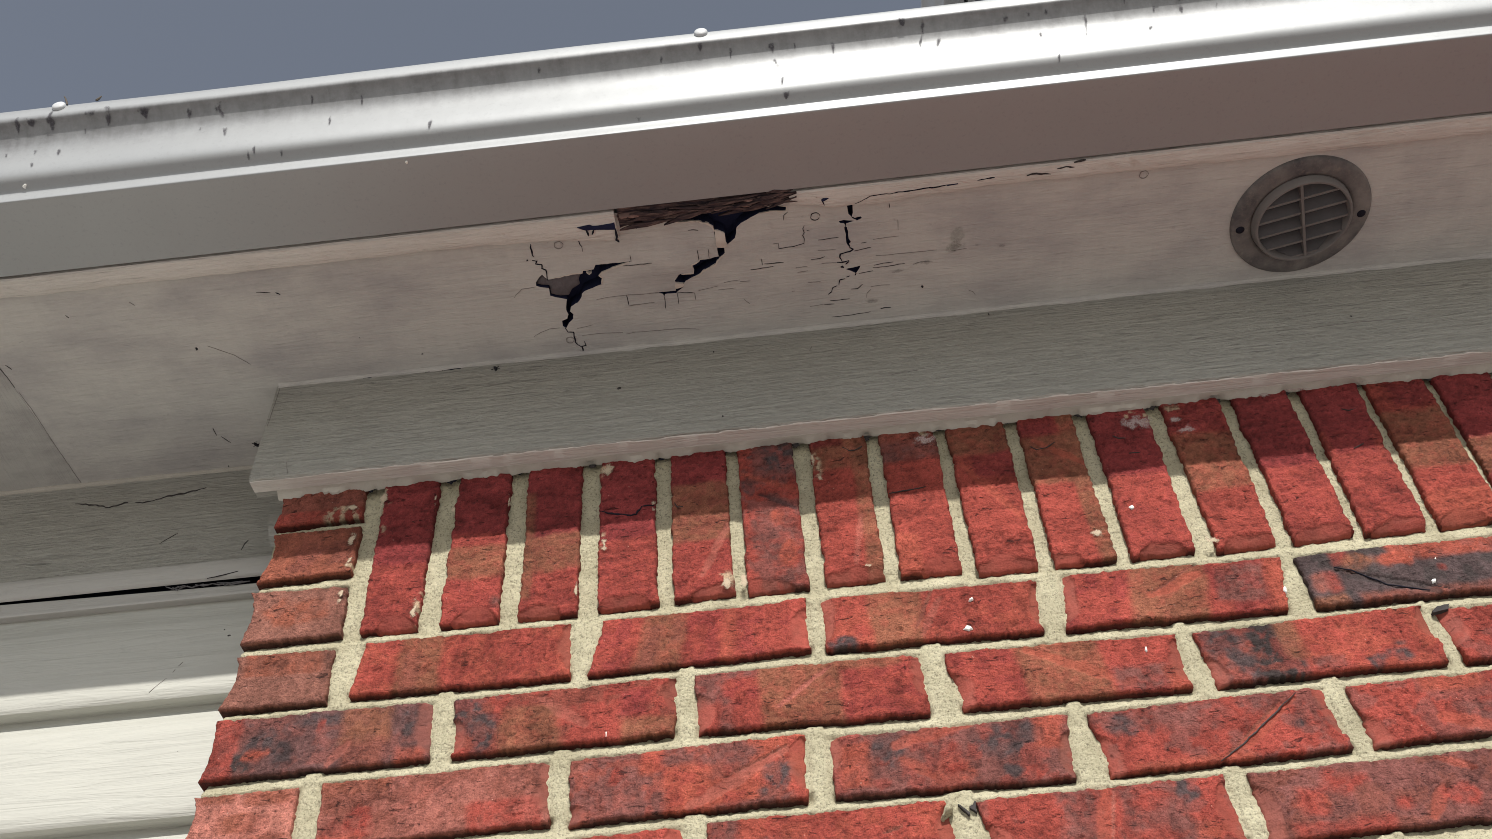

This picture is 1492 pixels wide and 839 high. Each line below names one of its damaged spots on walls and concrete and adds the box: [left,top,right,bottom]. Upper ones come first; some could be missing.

crack [577,302,691,336]
spalling [514,205,787,351]
crack [699,159,1086,317]